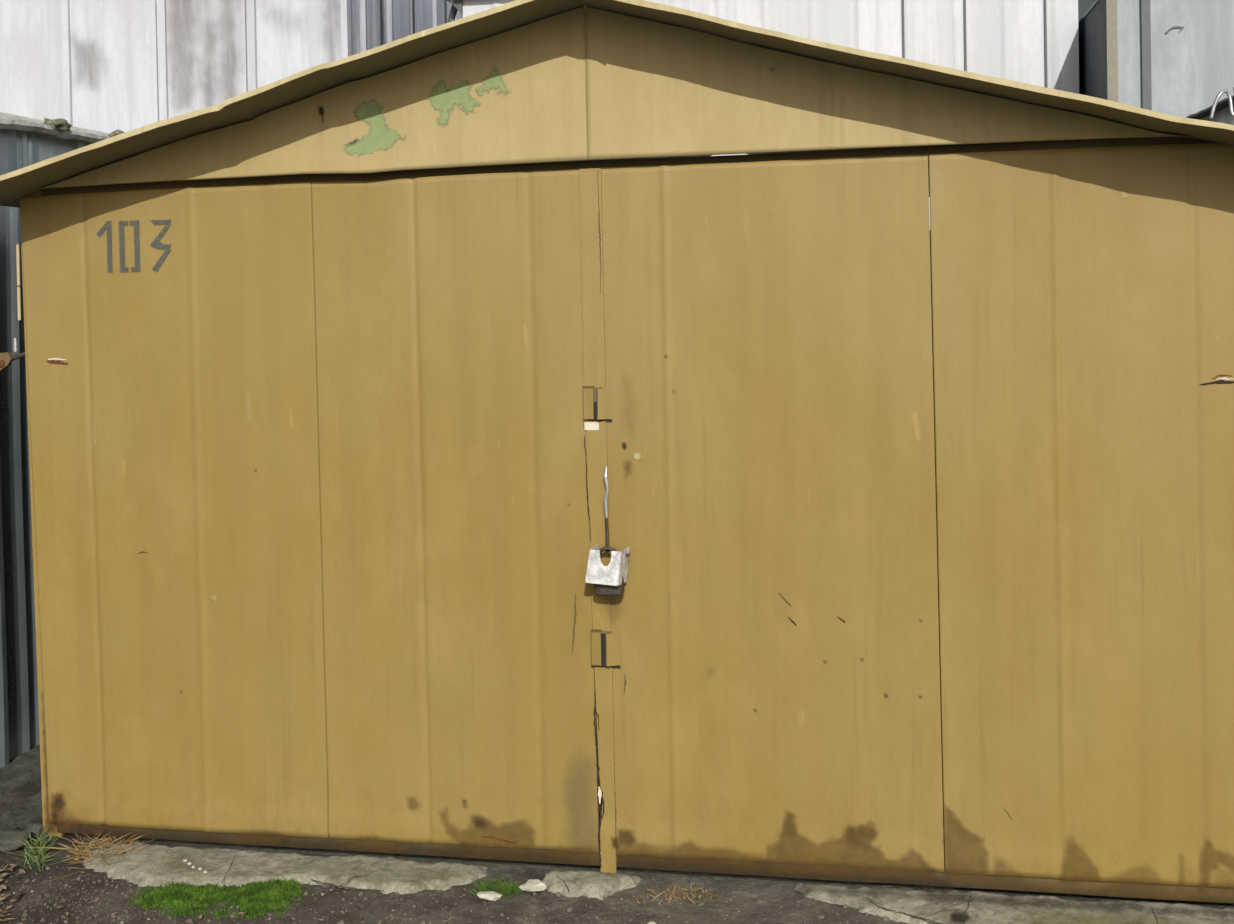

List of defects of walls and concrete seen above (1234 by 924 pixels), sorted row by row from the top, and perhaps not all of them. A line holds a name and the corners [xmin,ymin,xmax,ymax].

peeling [428,67,508,125]
peeling [345,100,403,156]